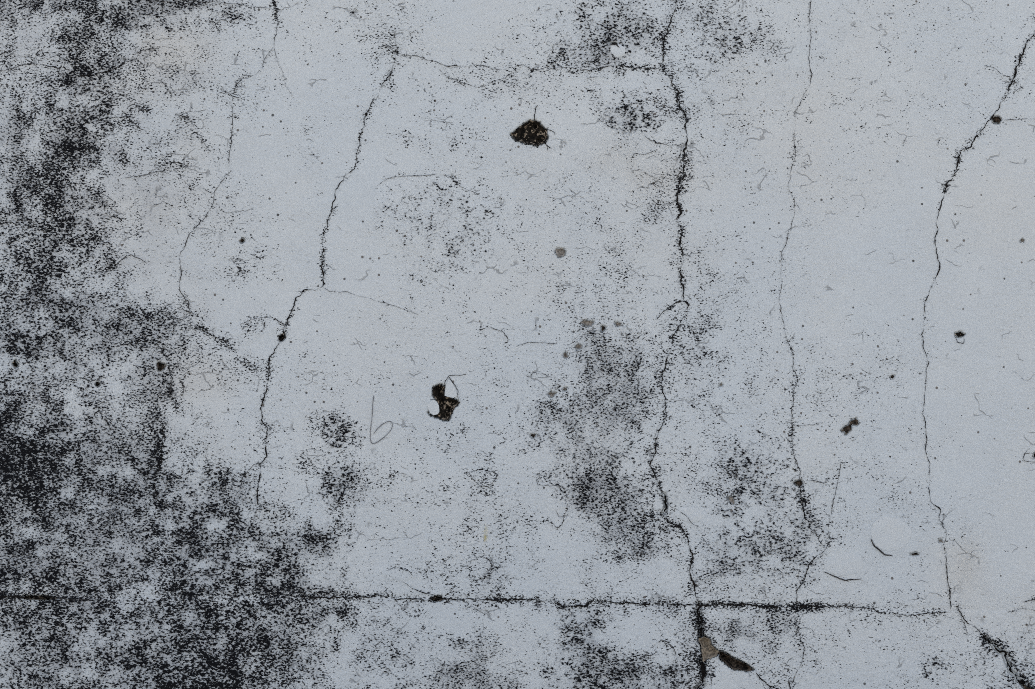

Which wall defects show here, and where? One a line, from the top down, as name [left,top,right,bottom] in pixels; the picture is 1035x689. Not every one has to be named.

crack [179,0,290,314]
spalling [511,105,555,150]
leakage [0,0,362,689]
spalling [427,374,466,421]
leakage [521,325,665,563]
crack [240,1,1034,689]
spalling [699,637,719,662]